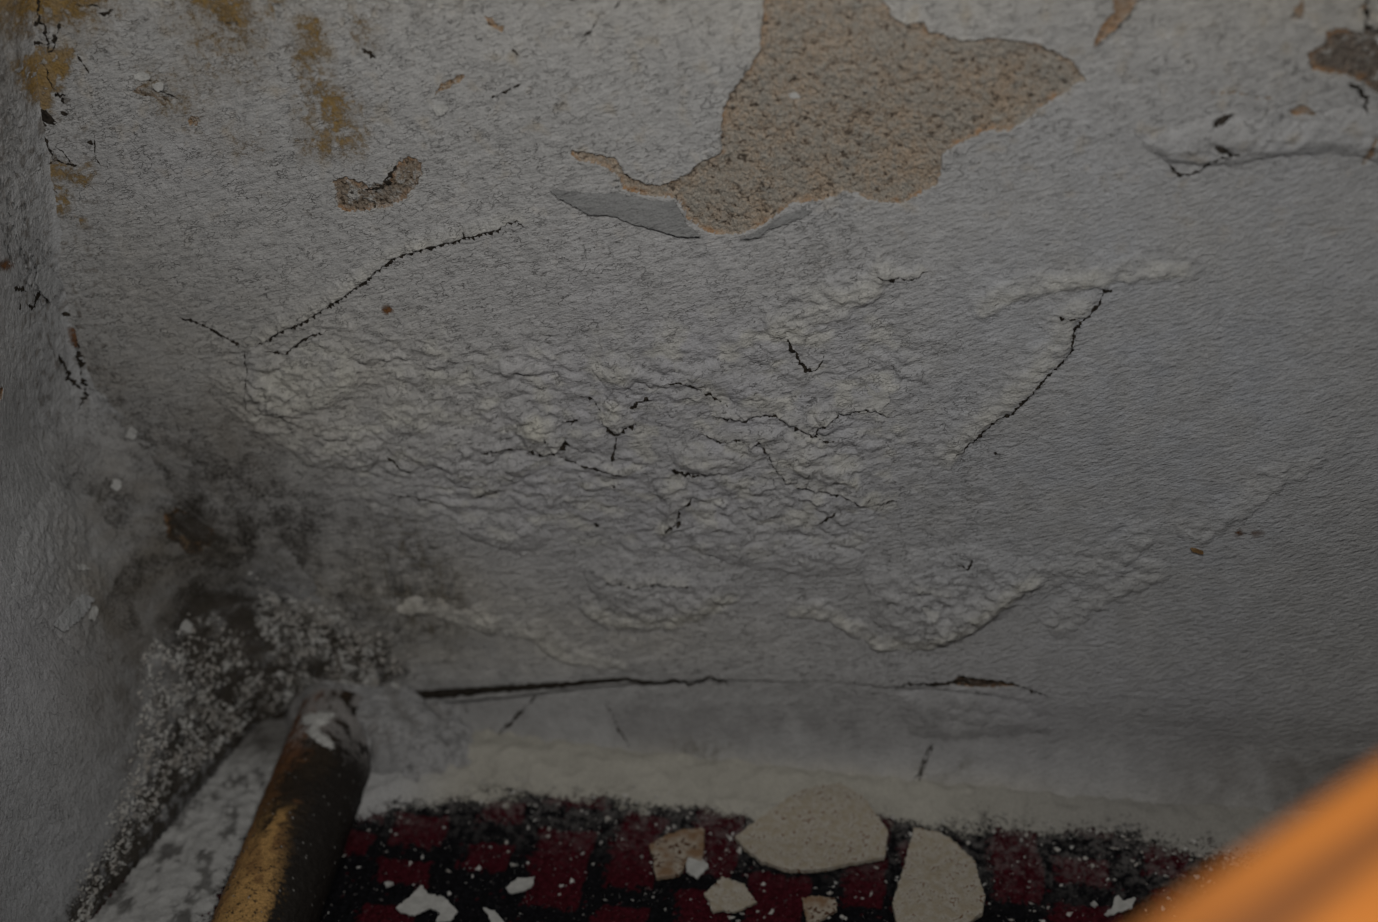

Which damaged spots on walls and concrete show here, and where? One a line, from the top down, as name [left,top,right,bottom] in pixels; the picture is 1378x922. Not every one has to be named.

spalling [1091,0,1144,50]
spalling [1304,0,1378,98]
spalling [330,153,426,215]
spalling [551,0,1090,240]
spalling [1169,146,1241,177]
spalling [1211,110,1238,129]
crack [181,208,535,414]
crack [953,289,1112,459]
crack [387,339,901,524]
leakage [66,418,460,922]
crack [395,676,727,746]
crack [896,675,1050,697]